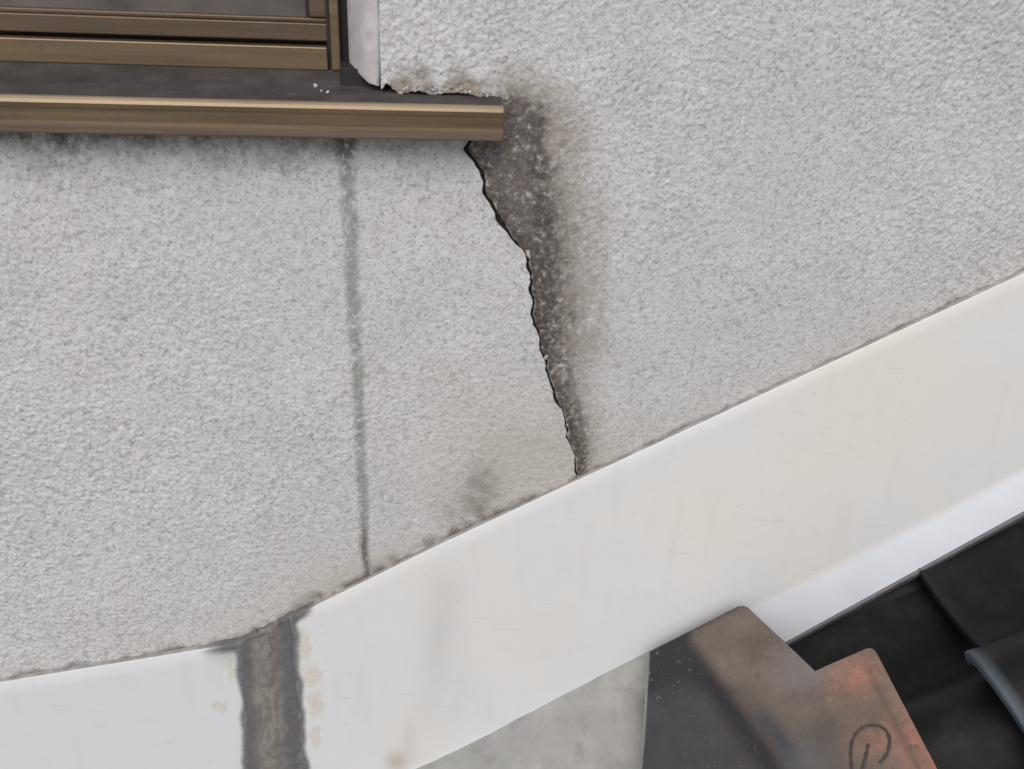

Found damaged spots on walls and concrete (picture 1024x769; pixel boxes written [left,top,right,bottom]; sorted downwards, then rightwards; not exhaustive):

leakage [336,139,370,577]
crack [463,141,578,476]
leakage [471,83,592,470]
leakage [216,634,255,769]
leakage [273,604,309,769]